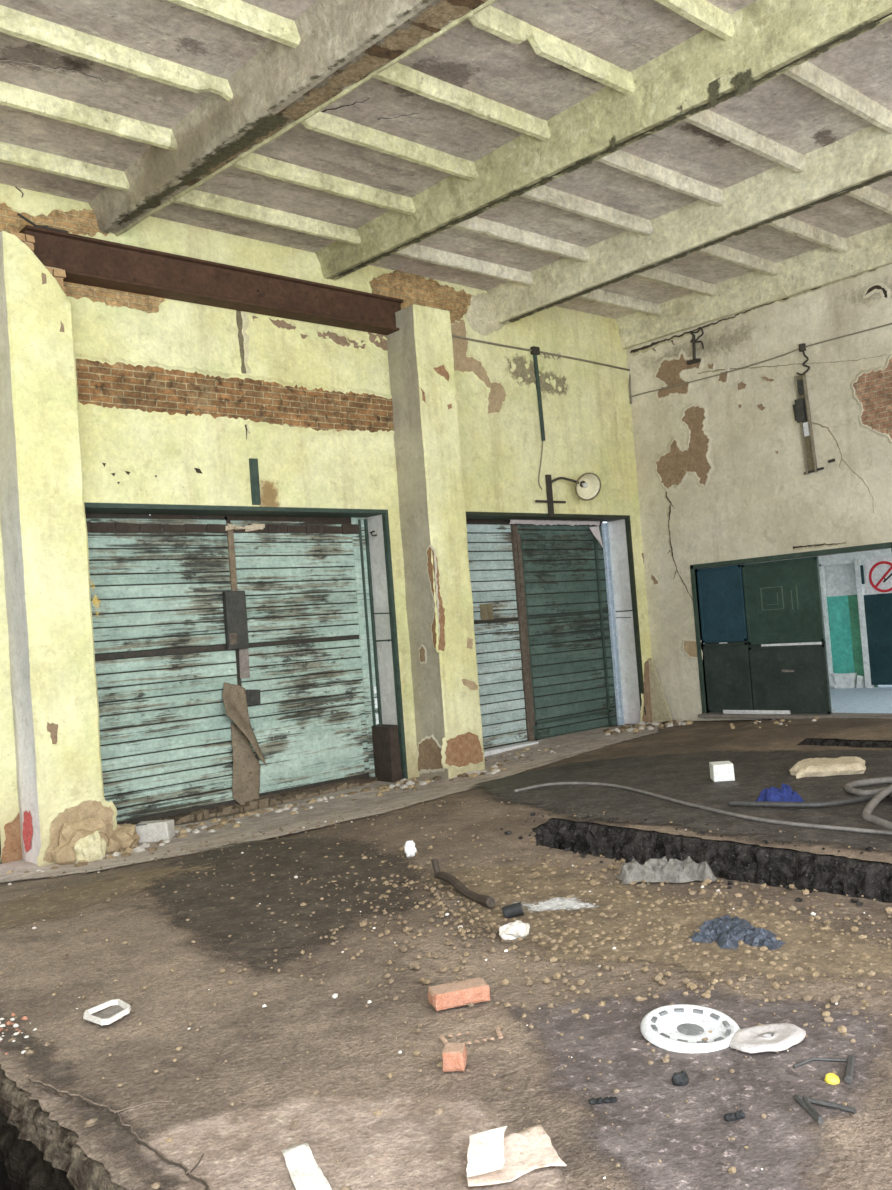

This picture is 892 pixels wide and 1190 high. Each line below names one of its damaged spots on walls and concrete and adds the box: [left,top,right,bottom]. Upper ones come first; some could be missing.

flaking render [0,201,110,253]
flaking render [75,354,394,437]
spalling [431,362,451,384]
flaking render [850,354,892,445]
crack [664,490,693,601]
spalling [418,545,447,664]
spalling [417,728,485,774]
spalling [37,796,117,866]
crack [28,1078,210,1190]